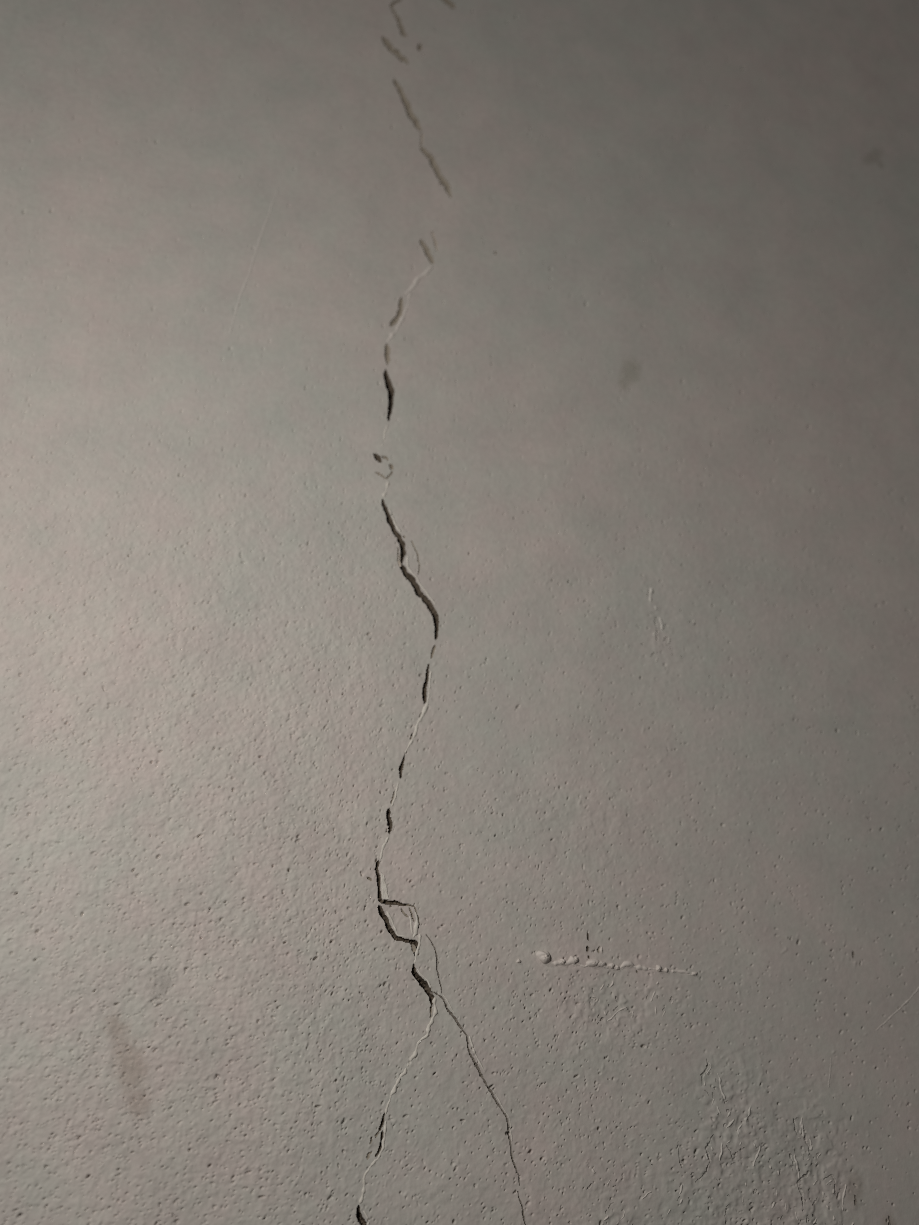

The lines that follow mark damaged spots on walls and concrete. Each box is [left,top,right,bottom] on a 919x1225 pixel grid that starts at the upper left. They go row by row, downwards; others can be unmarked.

crack [382,0,452,198]
crack [355,231,526,1225]